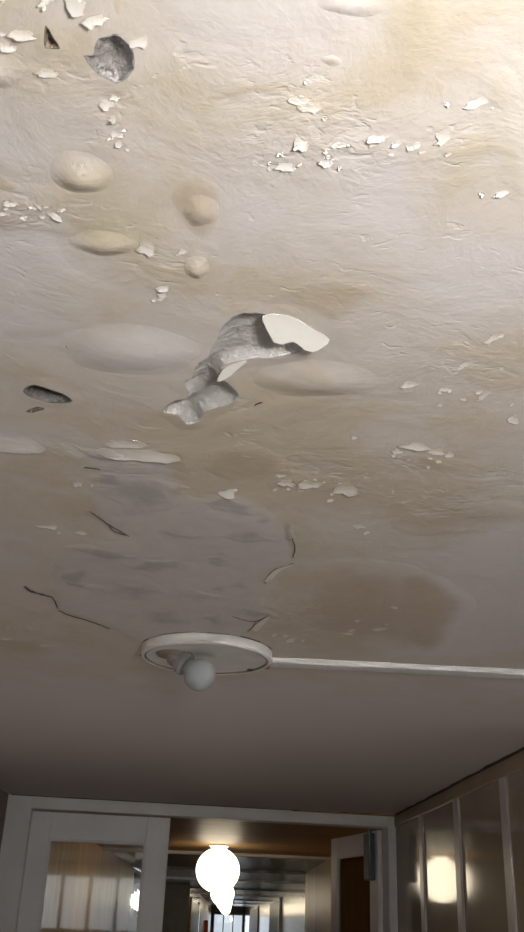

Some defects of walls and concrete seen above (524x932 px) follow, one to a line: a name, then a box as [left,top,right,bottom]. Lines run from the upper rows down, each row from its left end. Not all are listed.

spalling [0,0,159,152]
peeling [287,95,327,121]
peeling [463,96,494,110]
peeling [267,136,308,172]
peeling [318,142,351,171]
peeling [367,127,455,157]
spalling [145,301,329,431]
spalling [9,377,87,416]
peeling [391,442,455,469]
crack [90,512,129,537]
crack [24,586,110,629]
damp [268,558,477,655]